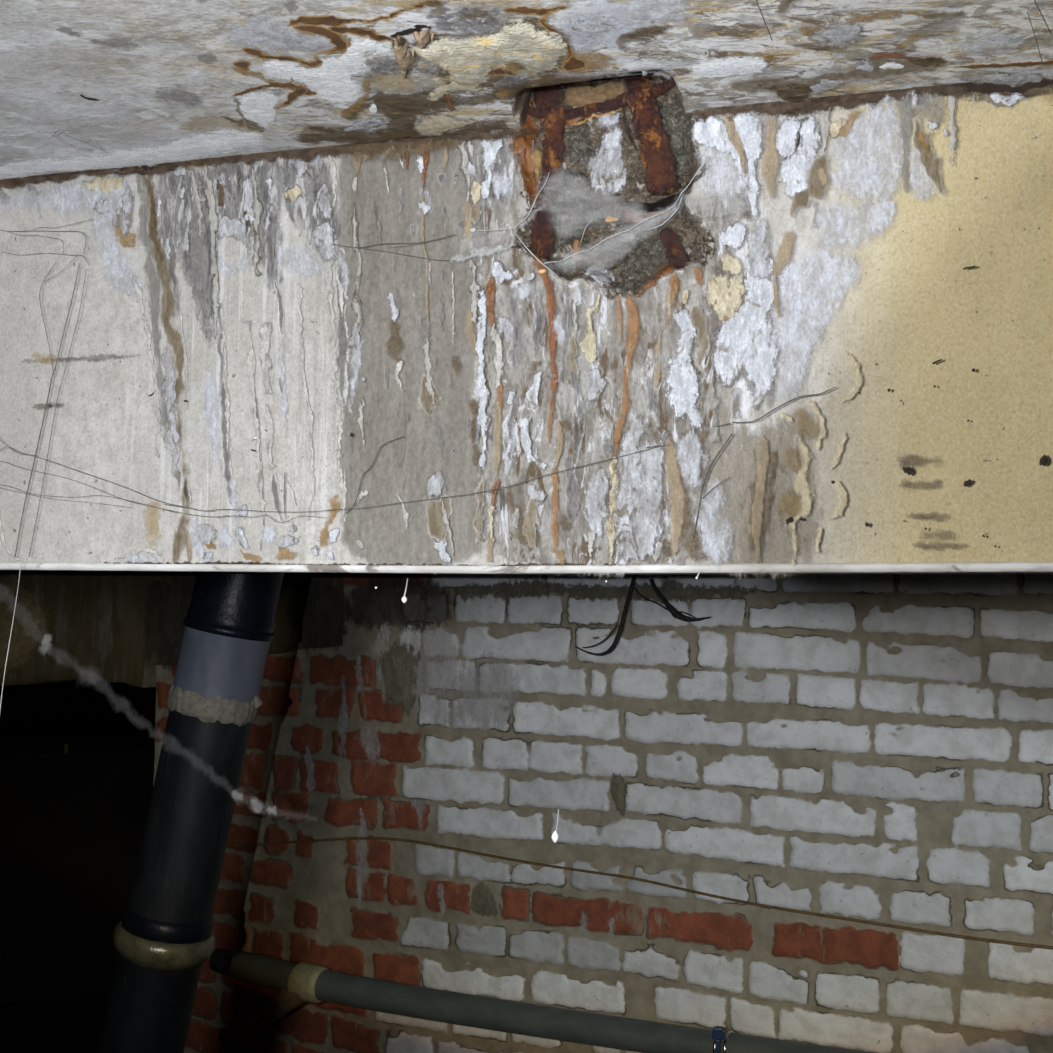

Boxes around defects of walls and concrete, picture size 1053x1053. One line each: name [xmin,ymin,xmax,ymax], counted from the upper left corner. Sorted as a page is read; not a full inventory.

leakage [229,20,391,131]
rust [232,0,448,130]
leakage [433,0,504,38]
rust [503,5,613,73]
leakage [692,52,776,79]
leakage [809,22,862,51]
leakage [856,60,904,73]
spalling [410,13,717,300]
rust [486,277,503,562]
leakage [0,70,1053,670]
rust [527,78,680,565]
rust [605,206,703,325]